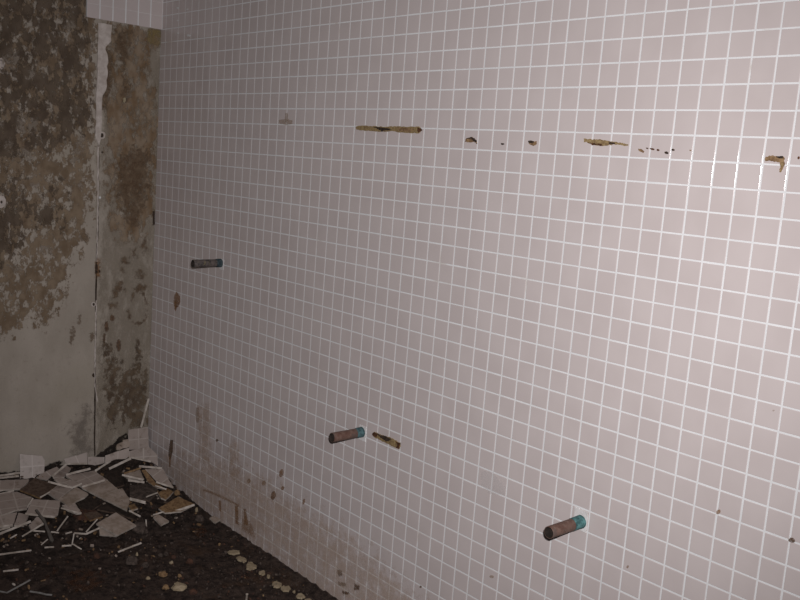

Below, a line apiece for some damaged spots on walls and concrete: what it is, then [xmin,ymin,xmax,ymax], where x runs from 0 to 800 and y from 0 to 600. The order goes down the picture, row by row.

leakage [0,0,161,457]